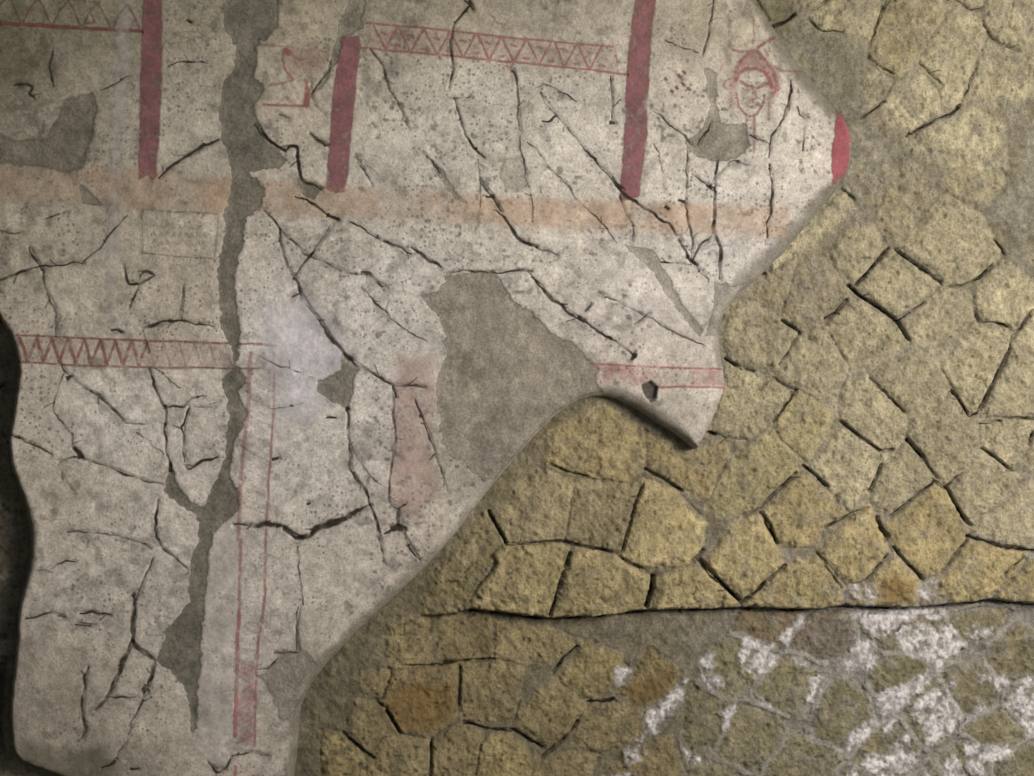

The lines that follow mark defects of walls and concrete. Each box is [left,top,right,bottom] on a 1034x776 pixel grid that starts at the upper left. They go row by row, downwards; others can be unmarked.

spalling [0,92,98,173]
crack [253,0,754,371]
spalling [157,0,287,732]
spalling [317,354,361,407]
spalling [421,270,602,479]
crack [10,267,218,770]
crack [234,319,443,669]
crack [468,519,909,620]
water stain [738,616,803,674]
water stain [845,581,993,776]
water stain [944,742,1013,776]
water stain [983,674,1034,735]